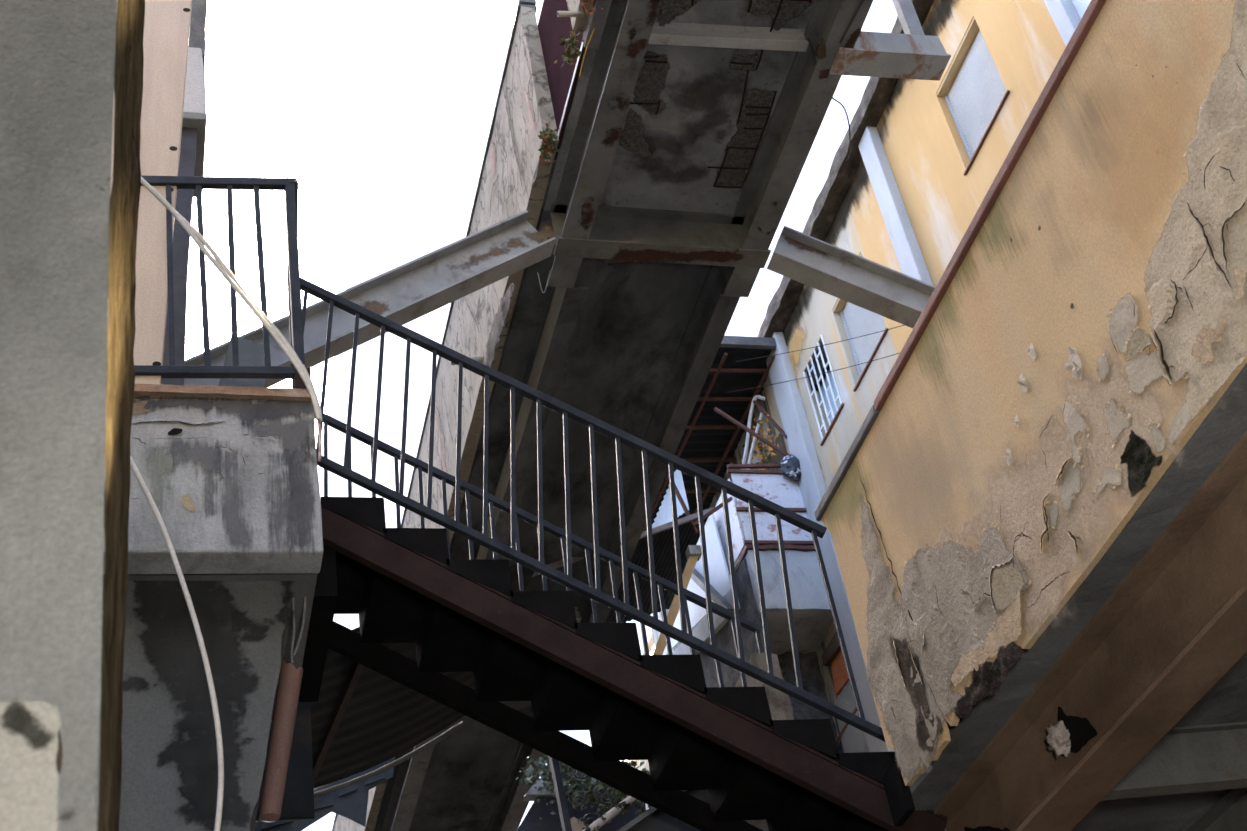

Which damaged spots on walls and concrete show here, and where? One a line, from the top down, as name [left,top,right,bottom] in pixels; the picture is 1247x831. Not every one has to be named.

corrosion [627,0,660,58]
corrosion [607,248,743,265]
corrosion [758,227,827,256]
peeling [860,0,1247,782]
water stain [135,396,315,553]
water stain [123,581,295,831]